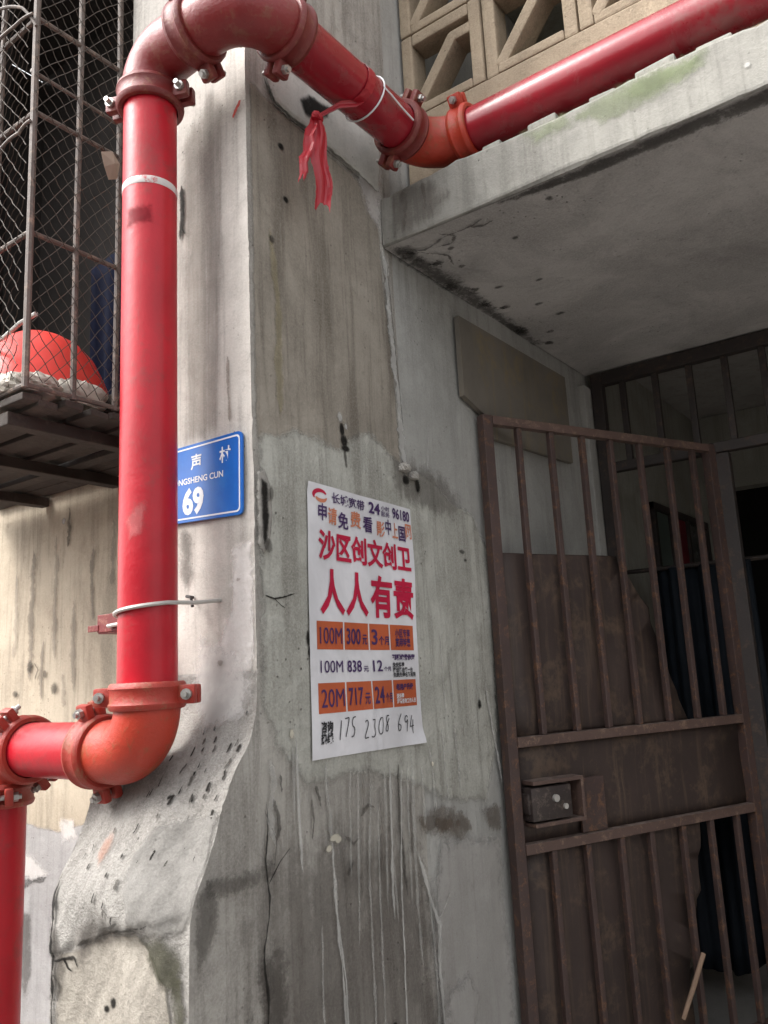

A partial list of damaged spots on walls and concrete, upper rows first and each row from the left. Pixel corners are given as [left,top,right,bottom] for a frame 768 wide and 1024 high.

water stain [500,89,768,203]
crack [410,219,492,262]
water stain [393,248,553,345]
crack [264,811,289,1024]
water stain [338,921,349,1024]
water stain [389,765,408,1024]